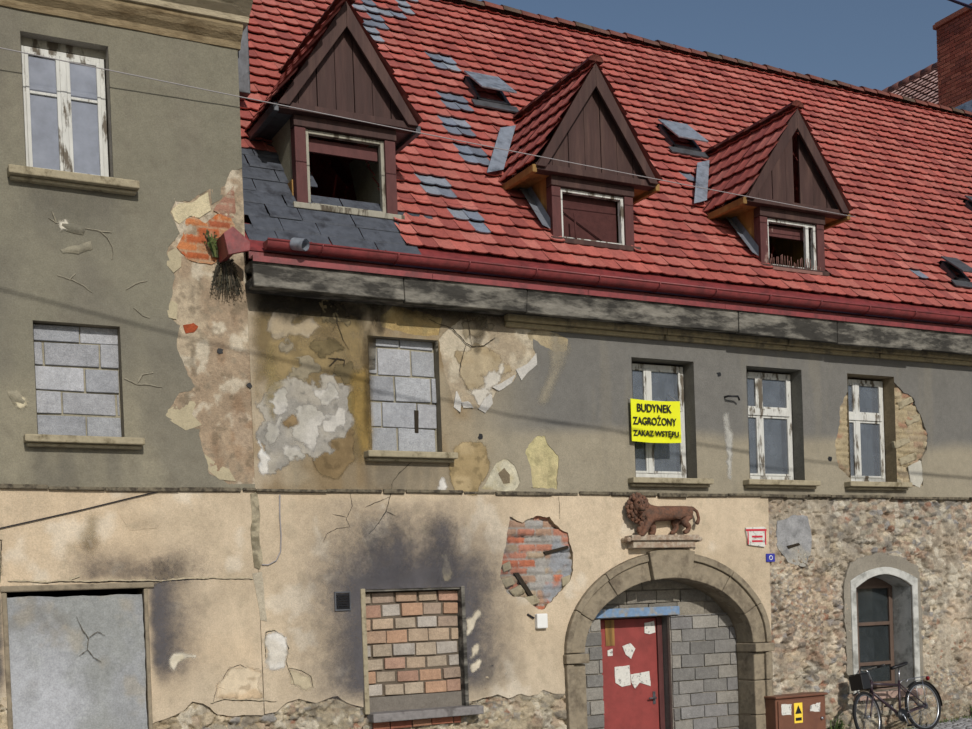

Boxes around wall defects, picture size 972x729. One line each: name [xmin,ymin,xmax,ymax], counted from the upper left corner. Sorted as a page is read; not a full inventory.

flaking render [166,168,355,621]
peeling [380,306,568,413]
flaking render [828,395,850,477]
flaking render [891,384,927,488]
crack [323,462,412,542]
flaking render [500,516,572,610]
crack [77,618,103,662]
peeling [216,632,312,700]